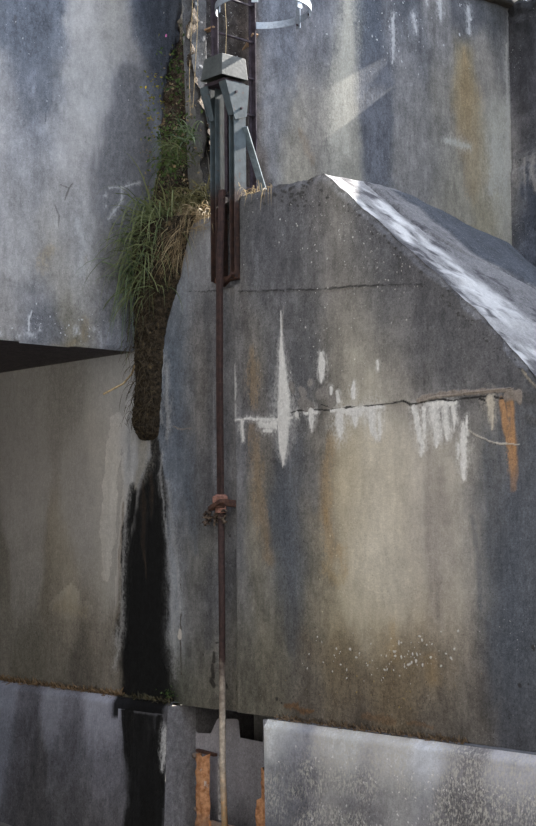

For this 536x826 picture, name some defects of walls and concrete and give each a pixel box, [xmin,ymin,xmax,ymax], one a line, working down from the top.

crack [291,387,512,414]
corrosion [500,401,516,469]
water stain [99,290,218,706]
water stain [234,308,394,666]
water stain [117,709,167,826]
water stain [266,733,402,772]
water stain [443,780,480,826]